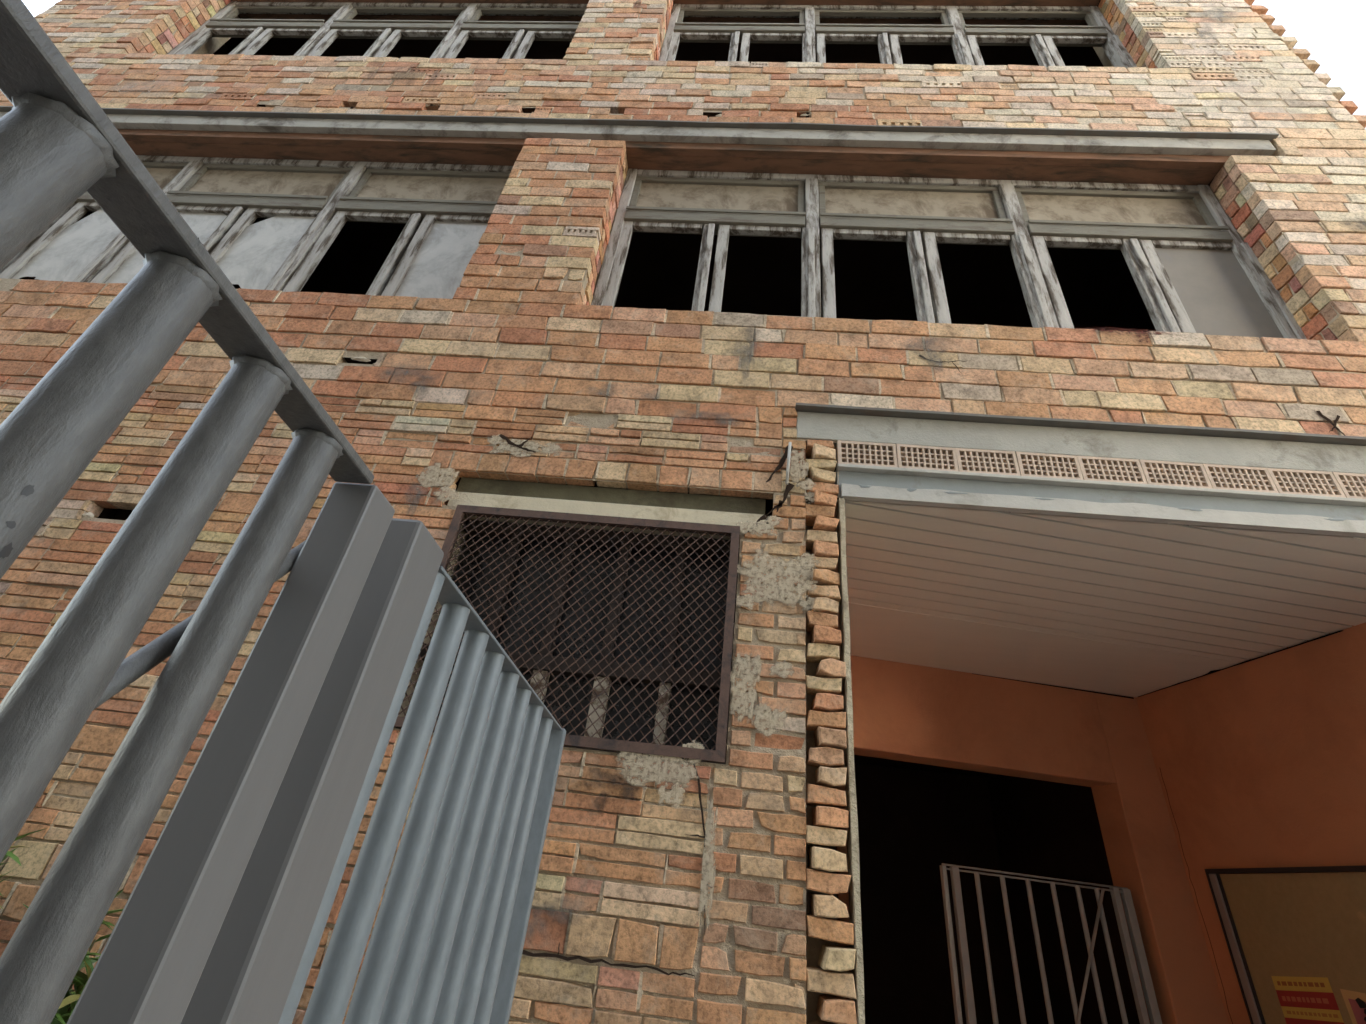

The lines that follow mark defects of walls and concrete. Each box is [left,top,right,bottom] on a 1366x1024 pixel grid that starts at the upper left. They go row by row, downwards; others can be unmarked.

spalling [488,435,562,457]
peeling [794,553,819,569]
peeling [736,594,756,610]
peeling [769,660,794,678]
peeling [753,703,787,736]
peeling [682,740,704,765]
peeling [658,782,685,808]